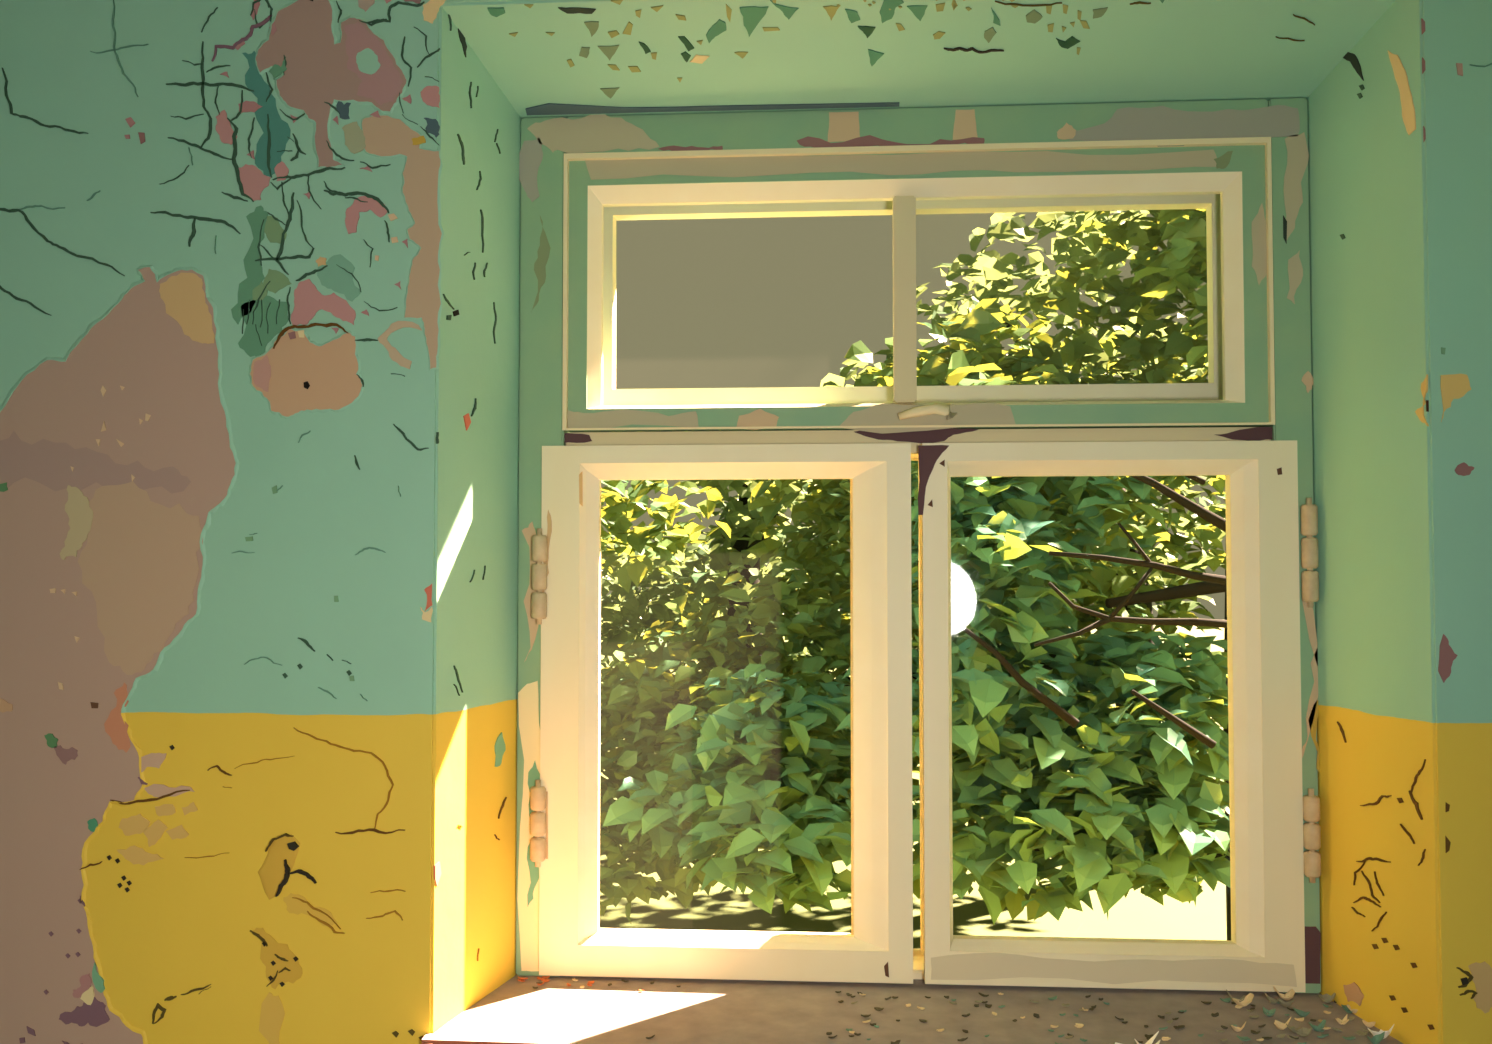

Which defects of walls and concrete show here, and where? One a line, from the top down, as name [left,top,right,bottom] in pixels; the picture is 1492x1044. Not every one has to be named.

crack [2,68,88,134]
crack [0,190,125,276]
crack [90,0,405,387]
peeling [233,0,459,370]
crack [336,1,501,344]
peeling [519,0,1309,308]
peeling [1343,52,1365,99]
peeling [1388,50,1426,143]
peeling [248,257,369,419]
peeling [0,265,239,1044]
crack [110,728,405,834]
crack [1351,759,1426,931]